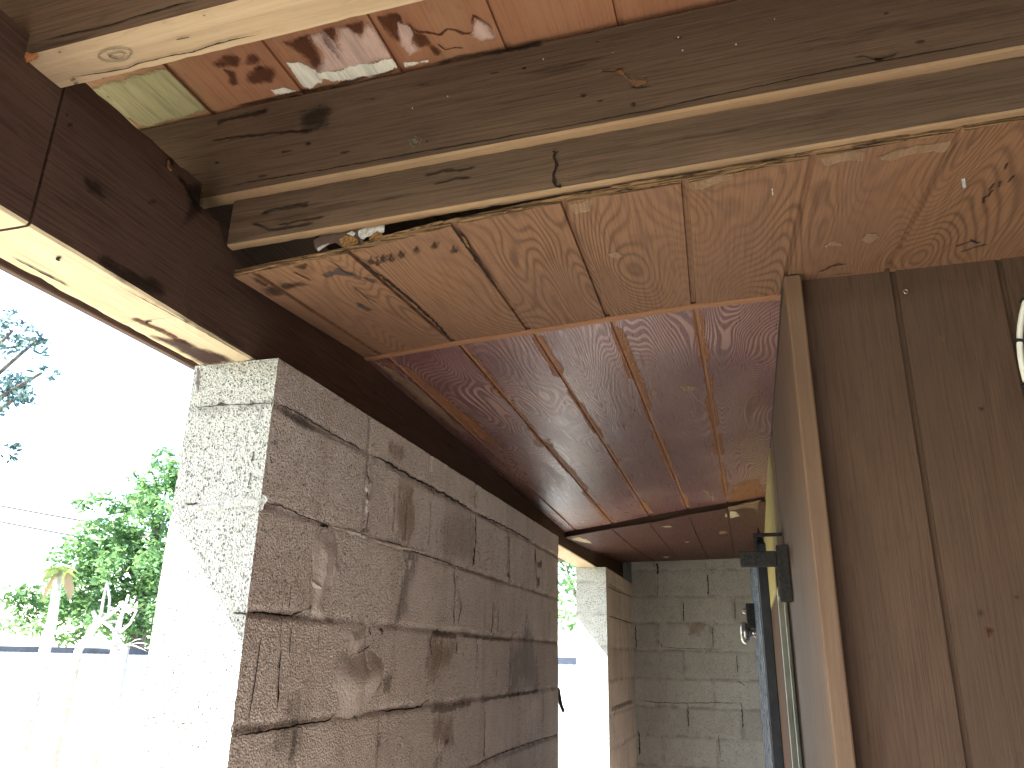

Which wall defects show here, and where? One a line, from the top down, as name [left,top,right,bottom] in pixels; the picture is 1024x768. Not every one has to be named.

damp [215,13,540,123]
damp [215,108,330,145]
crack [216,35,1022,189]
crack [197,402,537,576]
crack [233,609,306,617]
crack [380,696,429,712]
crack [234,710,339,737]
crack [473,735,555,767]